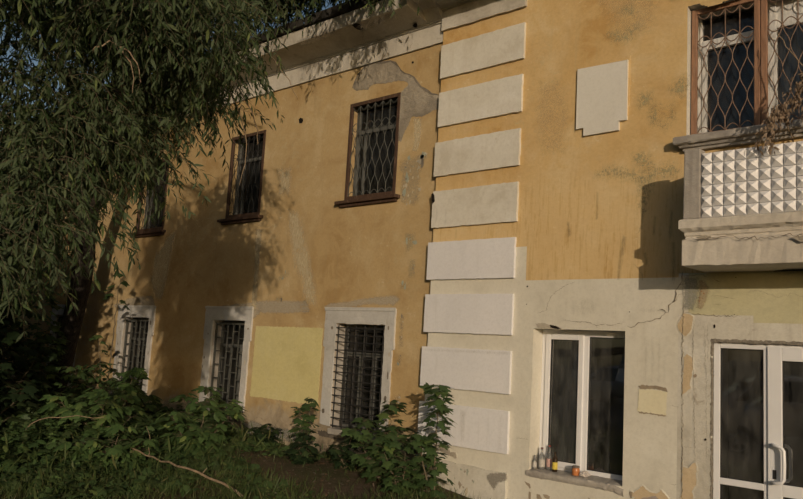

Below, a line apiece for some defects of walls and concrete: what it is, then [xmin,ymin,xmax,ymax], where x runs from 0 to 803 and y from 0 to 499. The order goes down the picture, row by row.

spalling [353,62,439,142]
crack [687,232,802,240]
crack [565,272,757,499]
peeling [681,353,695,396]
spalling [487,473,507,488]
peeling [629,460,698,499]